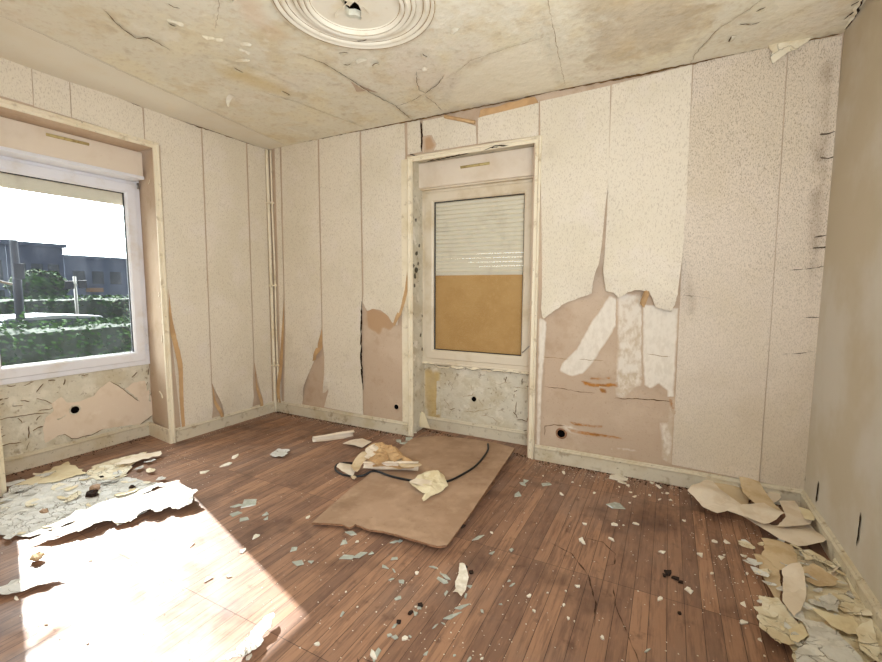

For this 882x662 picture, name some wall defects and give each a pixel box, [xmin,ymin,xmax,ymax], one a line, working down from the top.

crack [105,11,168,49]
crack [690,0,764,63]
crack [843,0,863,30]
crack [299,0,565,162]
peeling [0,367,163,450]